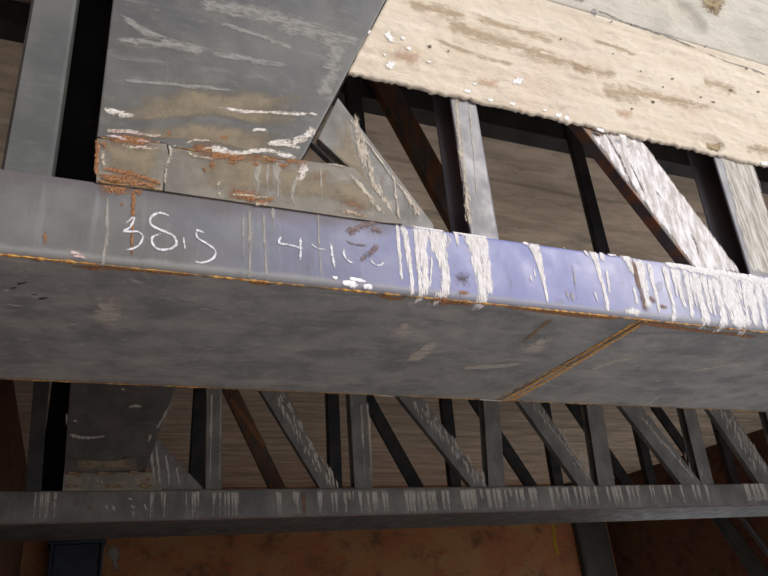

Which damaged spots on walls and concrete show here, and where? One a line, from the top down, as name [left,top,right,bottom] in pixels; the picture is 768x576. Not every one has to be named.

corrosion [94,134,161,256]
corrosion [73,266,189,276]
corrosion [194,144,304,172]
damp [100,91,493,310]
corrosion [335,184,381,261]
corrosion [430,290,471,305]
damp [523,242,548,302]
corrosion [505,261,756,402]
damp [584,133,768,335]
damp [404,490,450,511]
damp [413,401,538,509]
damp [743,484,767,500]